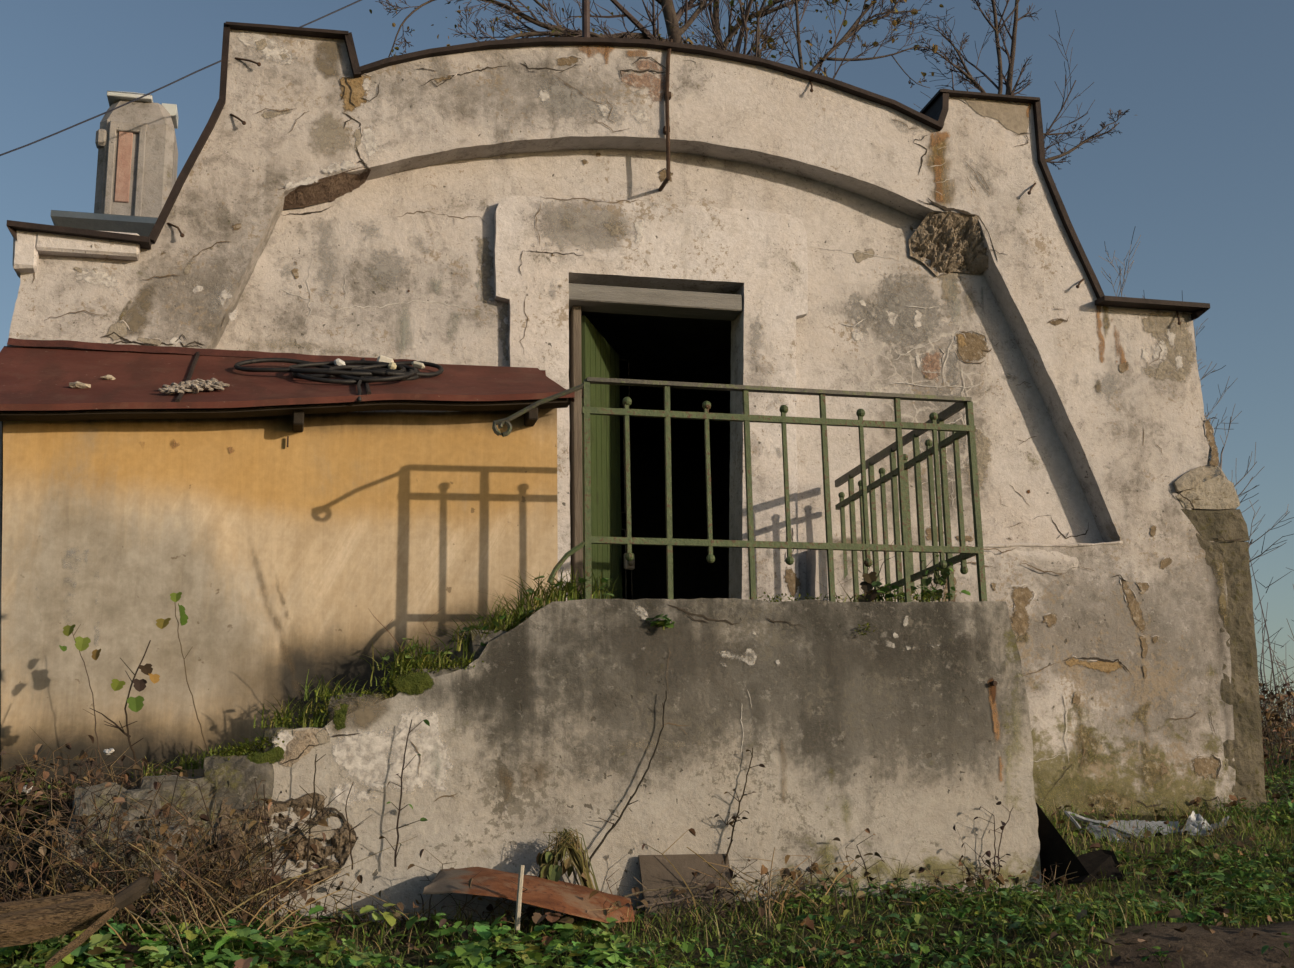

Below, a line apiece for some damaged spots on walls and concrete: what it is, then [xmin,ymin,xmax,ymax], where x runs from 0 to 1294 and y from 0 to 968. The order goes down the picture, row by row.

spalling [339,73,380,112]
peeling [539,57,666,132]
spalling [278,160,371,216]
spalling [809,198,1004,489]
rust [1096,305,1128,373]
peeling [991,583,1057,642]
peeling [1023,575,1160,679]
peeling [211,699,453,893]